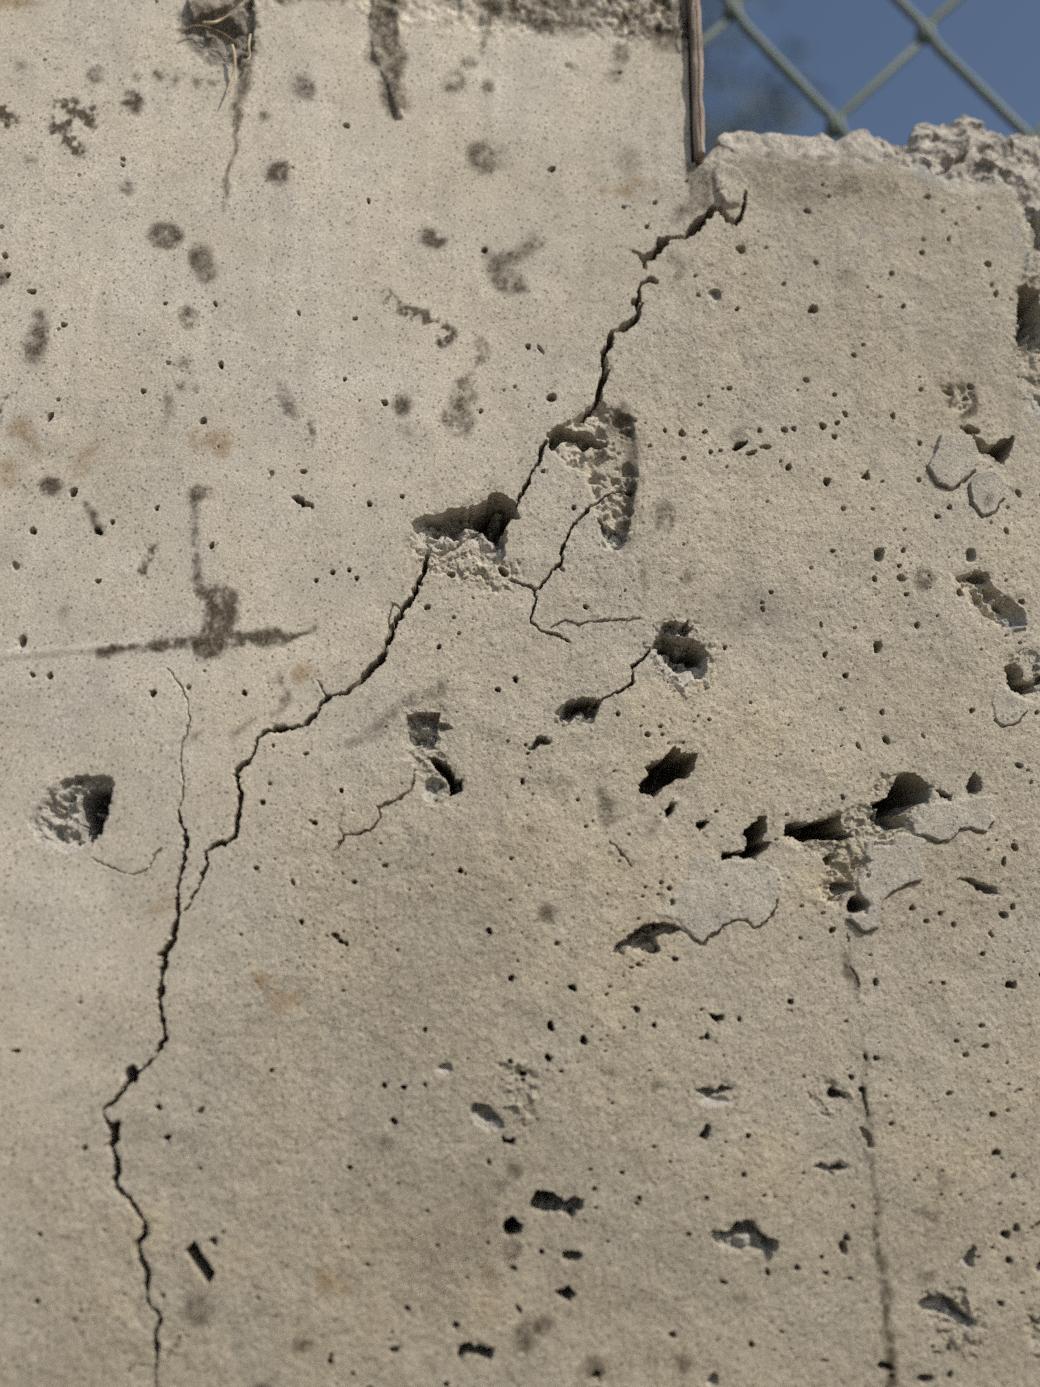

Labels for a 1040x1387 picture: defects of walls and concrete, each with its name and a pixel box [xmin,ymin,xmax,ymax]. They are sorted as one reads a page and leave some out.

crack [585,189,748,417]
spalling [695,114,1040,432]
crack [516,439,548,509]
spalling [546,400,640,552]
damp [194,554,209,598]
spalling [404,533,524,596]
crack [520,504,641,643]
crack [601,657,646,701]
spalling [954,548,1040,726]
peeling [656,852,784,941]
spalling [781,771,995,931]
crack [90,565,423,1387]